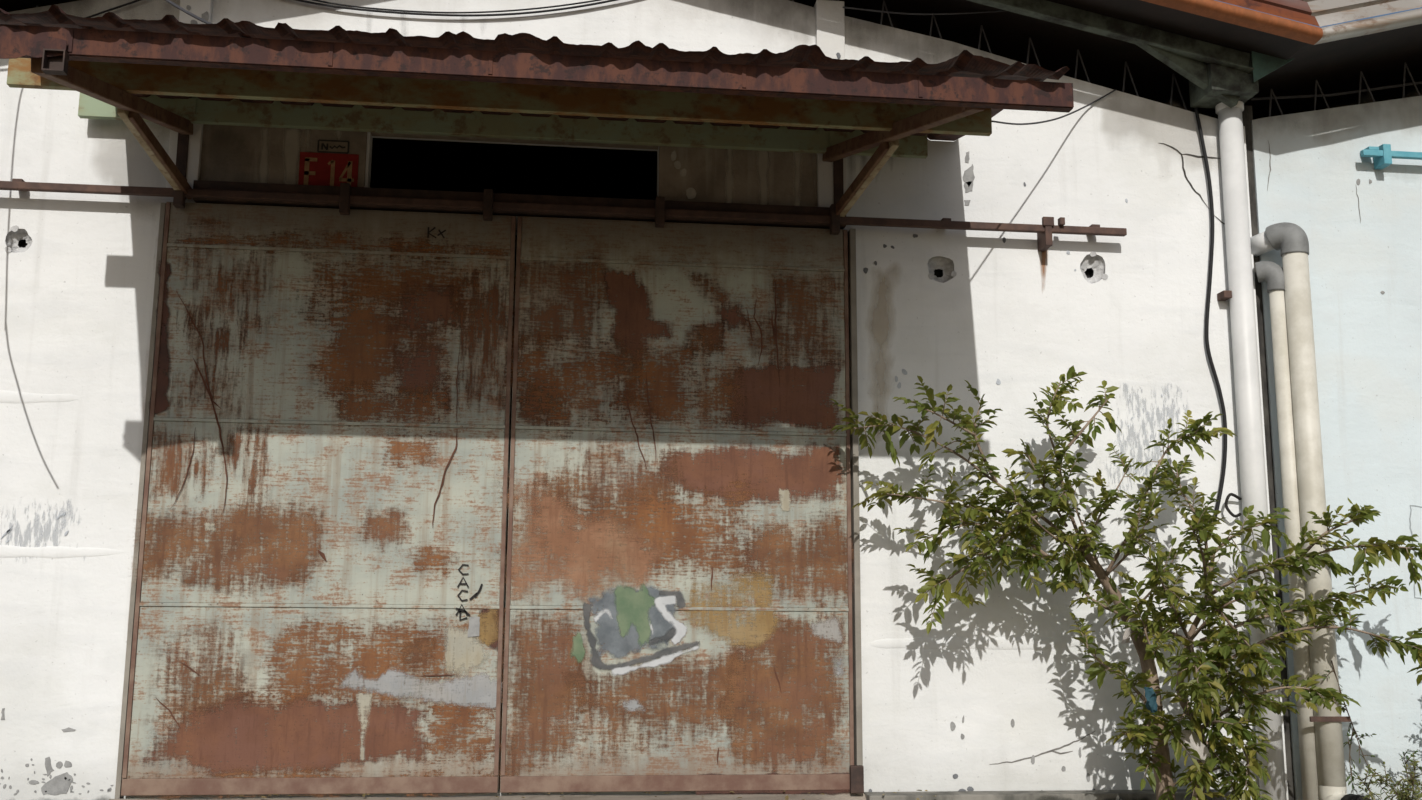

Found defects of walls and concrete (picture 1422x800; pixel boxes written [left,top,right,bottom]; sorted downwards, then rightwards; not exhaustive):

rust [137,219,854,799]
crack [989,731,1095,765]